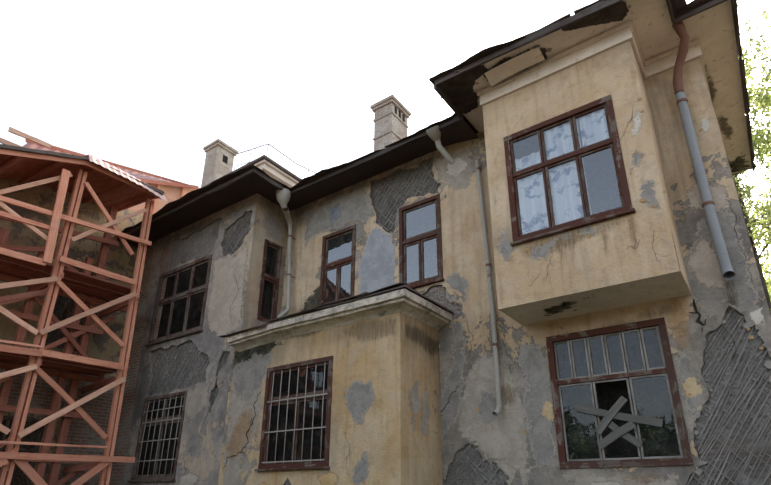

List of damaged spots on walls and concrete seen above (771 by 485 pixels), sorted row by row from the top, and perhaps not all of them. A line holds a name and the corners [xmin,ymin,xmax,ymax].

leakage [719,117,732,139]
leakage [730,152,756,173]
peeling [639,179,666,209]
flaking render [302,145,475,294]
peeling [144,210,284,485]
flaking render [424,208,771,485]
peeling [343,380,375,425]
crack [224,392,261,467]
peeling [351,451,370,485]